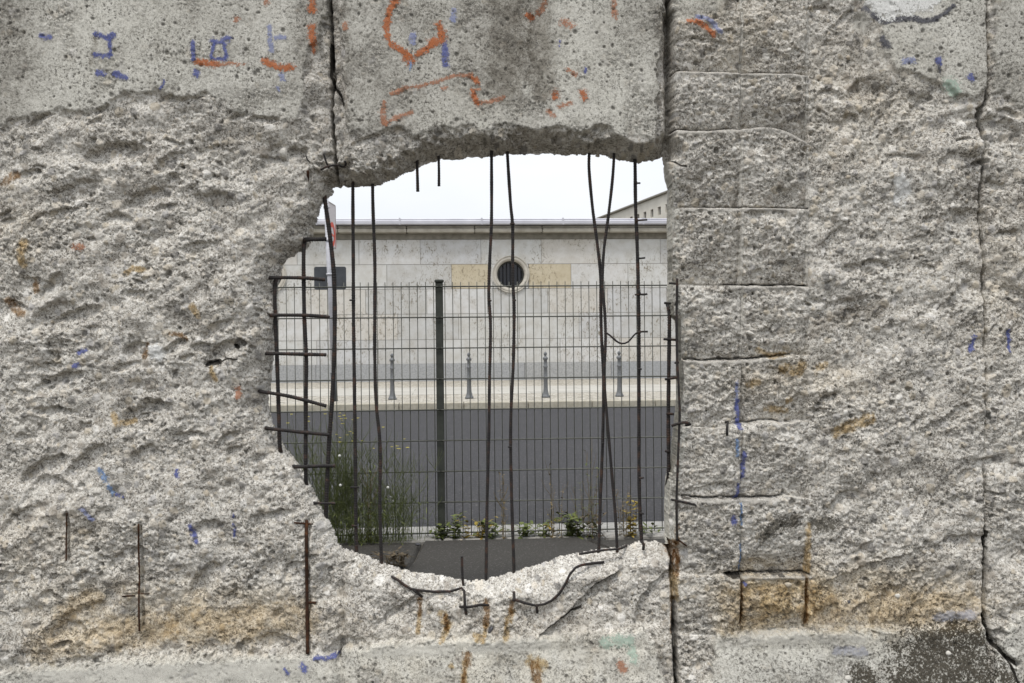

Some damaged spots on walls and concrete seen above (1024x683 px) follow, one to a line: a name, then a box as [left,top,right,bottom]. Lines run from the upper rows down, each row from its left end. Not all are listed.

crack [330,43,344,106]
spalling [0,16,741,683]
spalling [332,0,1024,676]
crack [980,530,988,564]
crack [980,612,1020,683]